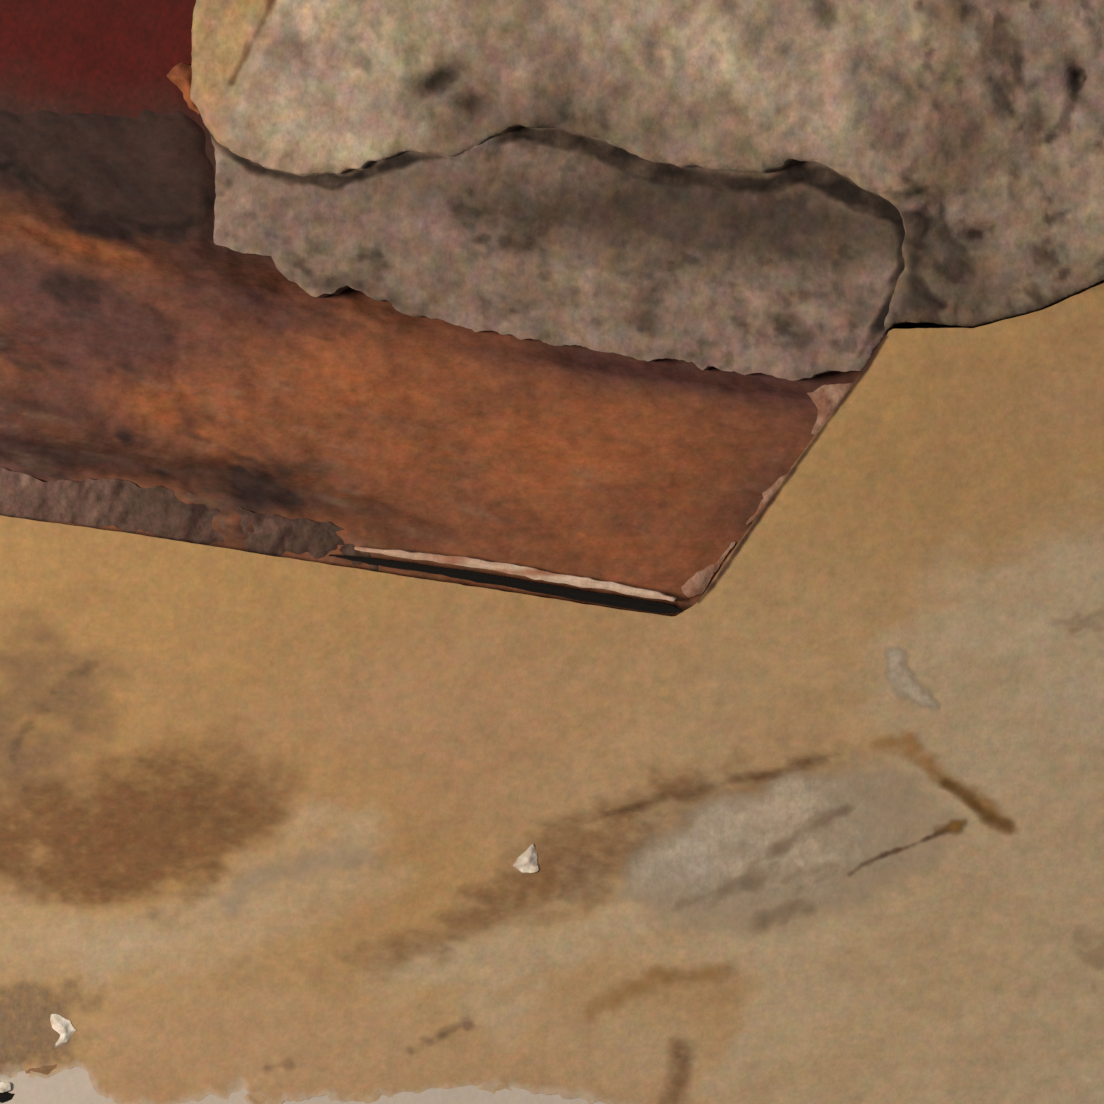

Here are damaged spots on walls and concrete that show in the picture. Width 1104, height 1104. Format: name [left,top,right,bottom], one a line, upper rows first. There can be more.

crack [212,136,424,189]
flaking render [0,110,861,616]
crack [329,128,944,613]
peeling [0,283,1104,1104]
damp [0,760,271,902]
corrosion [885,734,1009,828]
corrosion [938,821,964,832]